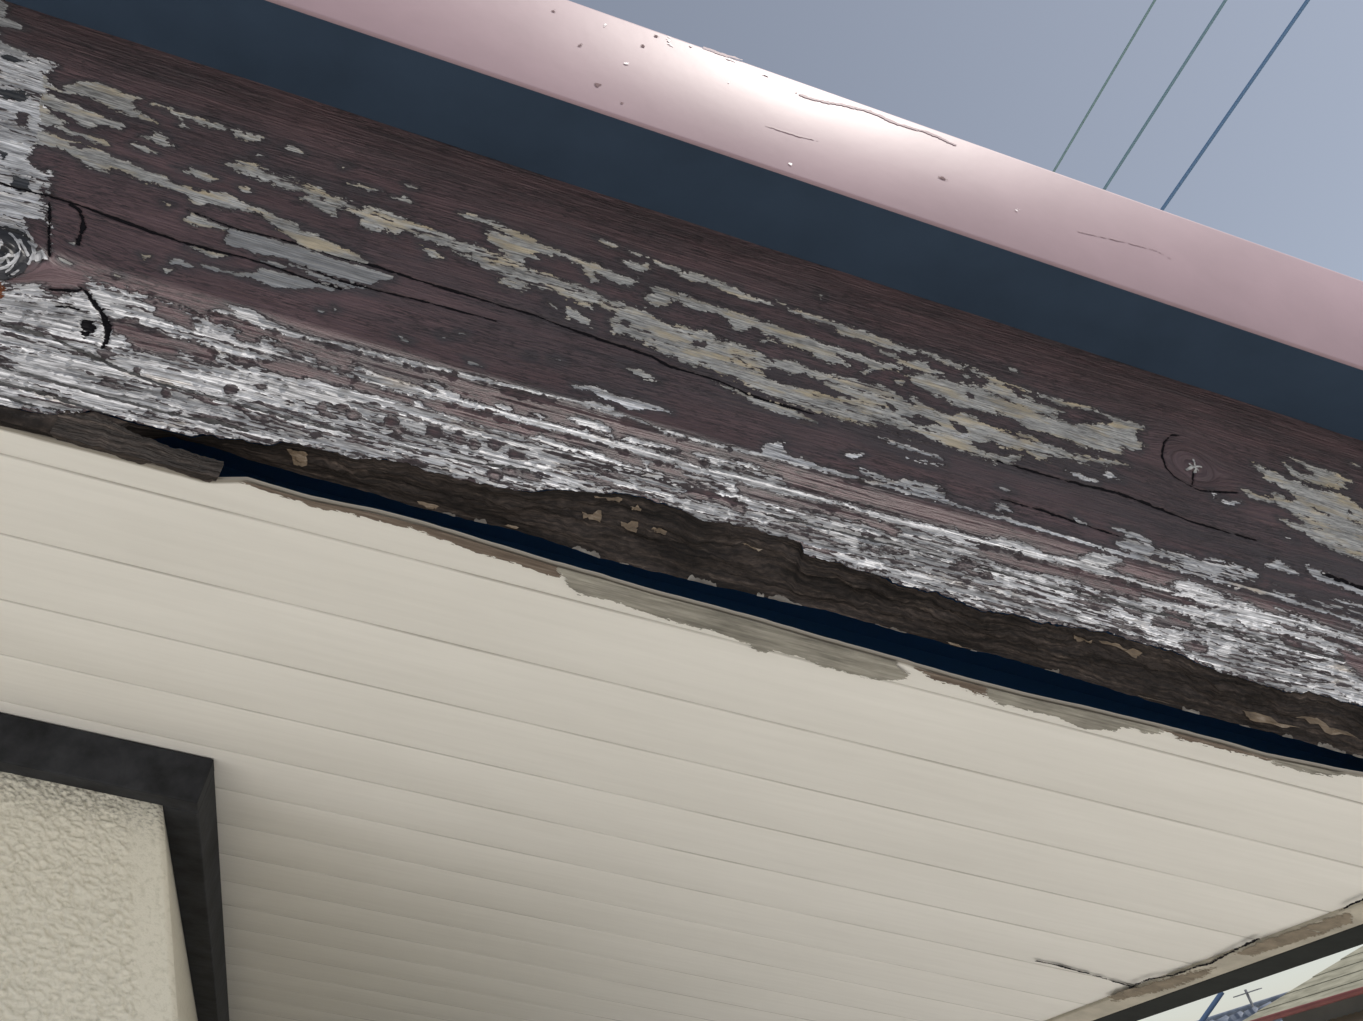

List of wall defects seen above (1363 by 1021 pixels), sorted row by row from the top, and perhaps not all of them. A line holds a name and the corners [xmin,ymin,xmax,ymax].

crack [0,182,814,472]
peeling [0,0,1145,483]
peeling [0,274,1363,706]
peeling [239,481,1361,777]
crack [996,459,1257,541]
crack [1036,938,1260,989]